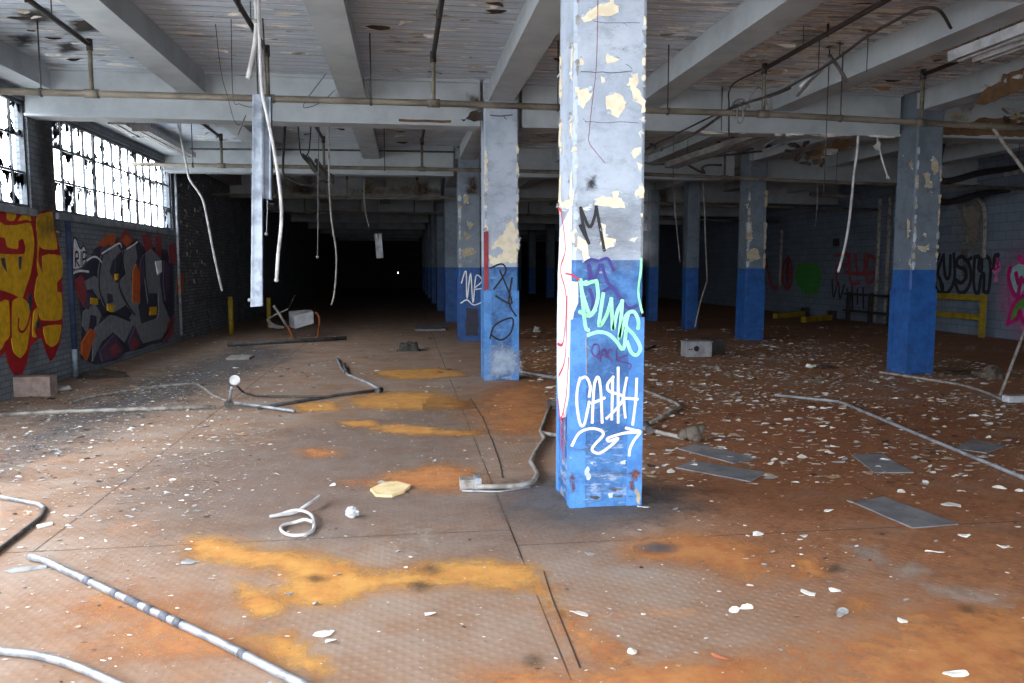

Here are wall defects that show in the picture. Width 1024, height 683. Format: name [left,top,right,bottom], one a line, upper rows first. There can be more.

peeling [365,21,441,42]
peeling [455,0,654,267]
peeling [943,54,1024,137]
peeling [745,191,767,268]
peeling [907,147,943,270]
rust [294,353,557,436]
rust [188,536,554,616]
rust [625,532,770,582]
rust [259,633,327,676]